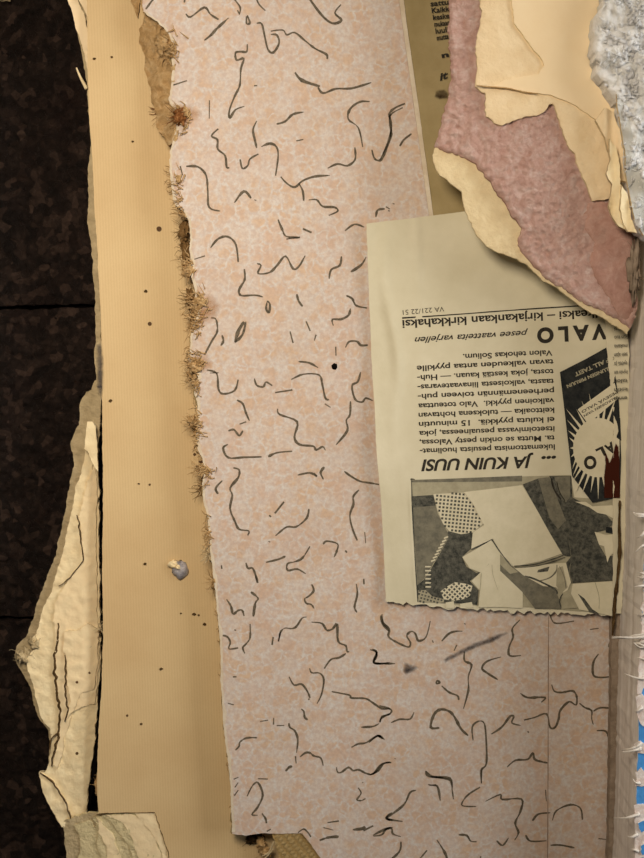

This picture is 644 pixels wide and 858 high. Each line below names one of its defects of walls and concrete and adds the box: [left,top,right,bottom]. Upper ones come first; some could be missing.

peeling [68,0,89,107]
peeling [432,0,643,334]
peeling [11,133,168,858]
peeling [612,572,644,726]
peeling [615,804,644,858]
peeling [621,740,644,754]
peeling [632,768,644,787]